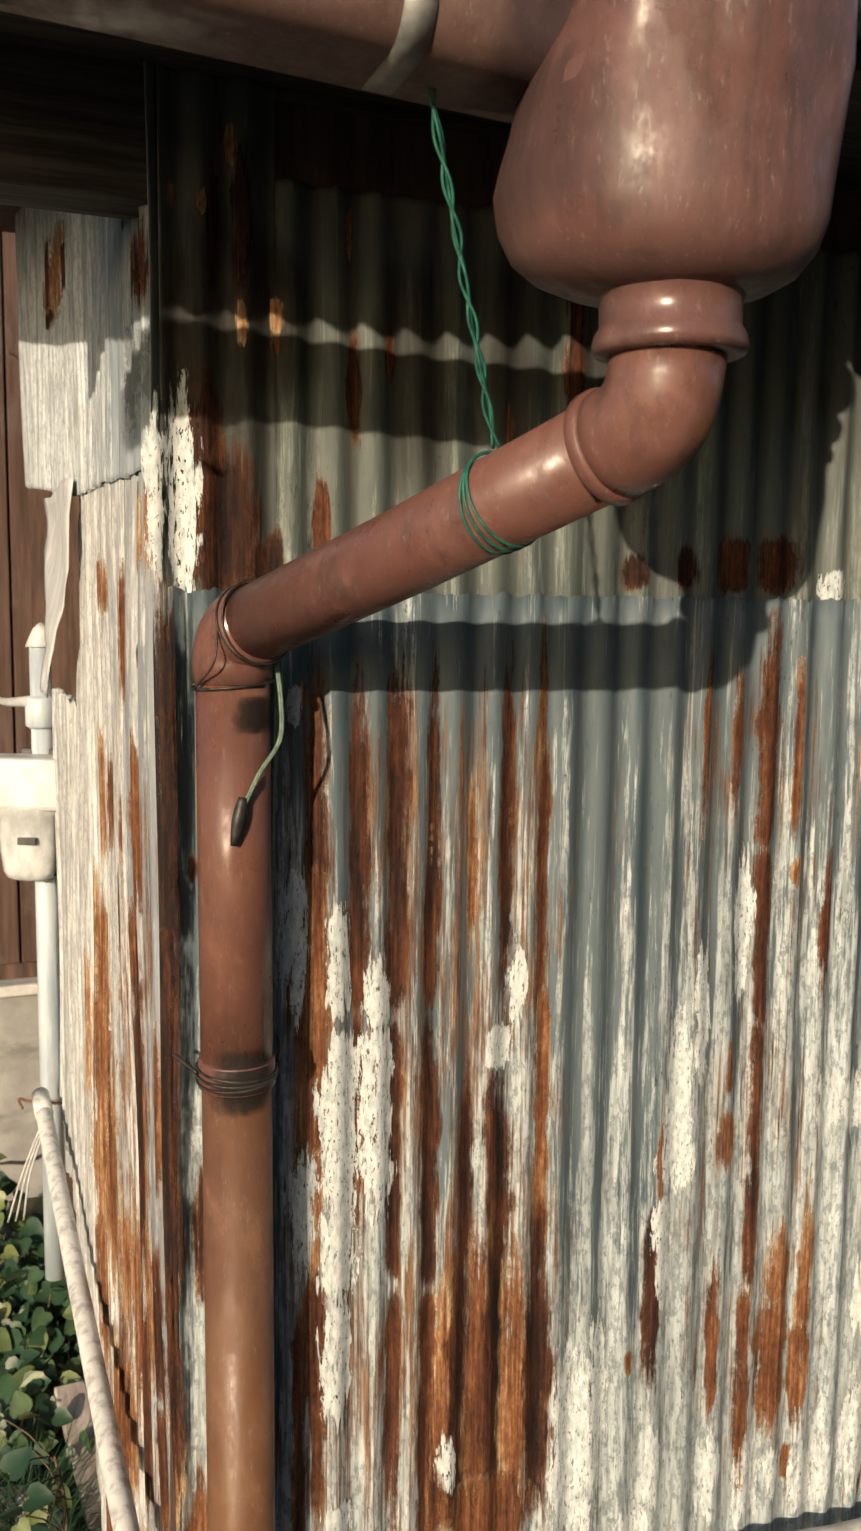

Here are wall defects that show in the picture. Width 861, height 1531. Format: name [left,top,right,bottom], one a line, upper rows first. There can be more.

rust [42,217,67,329]
rust [130,217,149,307]
rust [237,299,249,347]
rust [270,296,283,357]
peeling [124,321,204,593]
rust [184,366,284,591]
rust [622,553,650,591]
rust [84,479,208,1531]
rust [273,624,572,1531]
rust [677,534,833,1496]
rust [624,1125,664,1391]